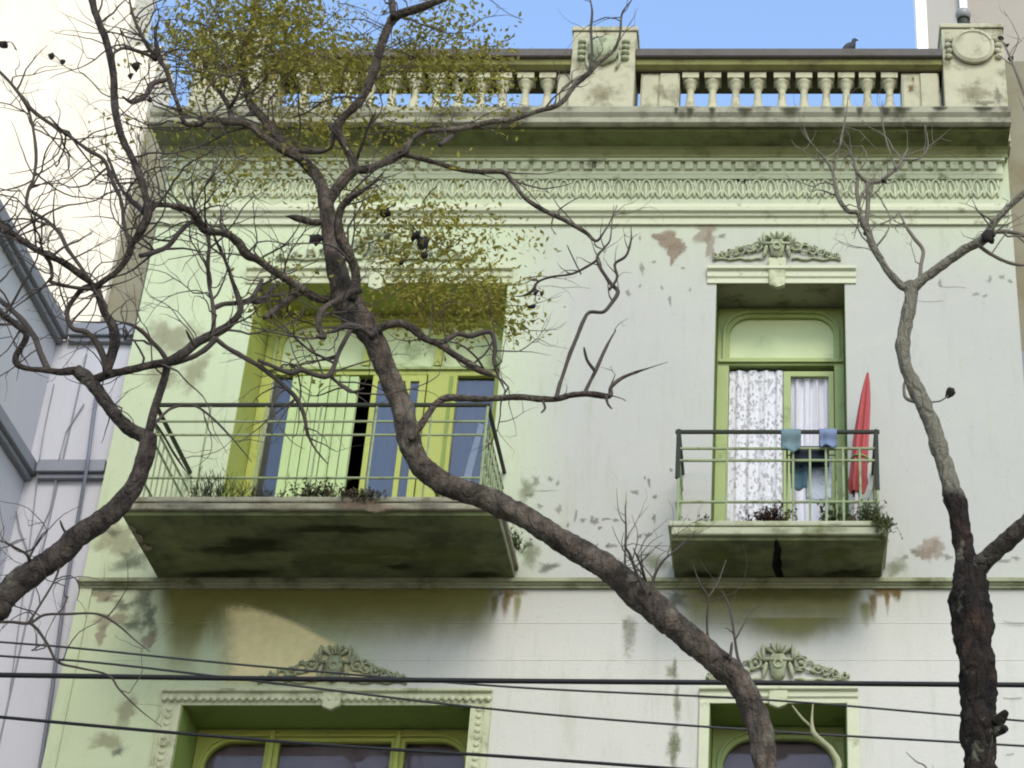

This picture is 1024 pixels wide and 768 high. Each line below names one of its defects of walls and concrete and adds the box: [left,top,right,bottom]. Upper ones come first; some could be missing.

peeling [653,231,686,264]
peeling [697,226,724,253]
damp [204,539,281,553]
crack [772,539,783,577]
peeling [915,538,943,559]
corrosion [492,590,520,611]
corrosion [862,589,900,616]